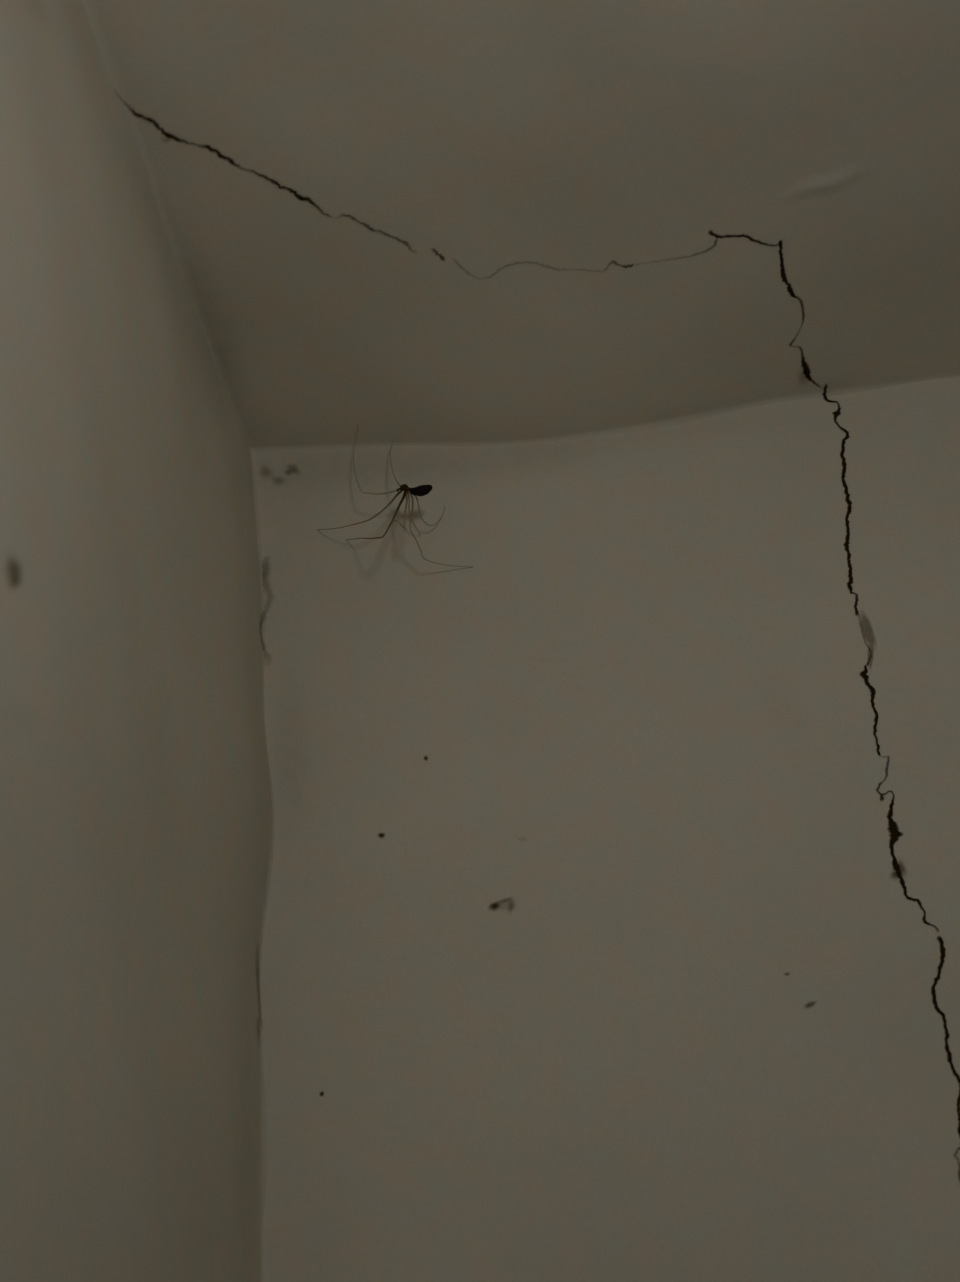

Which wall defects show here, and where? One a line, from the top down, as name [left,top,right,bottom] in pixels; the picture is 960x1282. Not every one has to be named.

crack [130,109,444,260]
crack [708,231,859,615]
crack [860,657,960,1179]